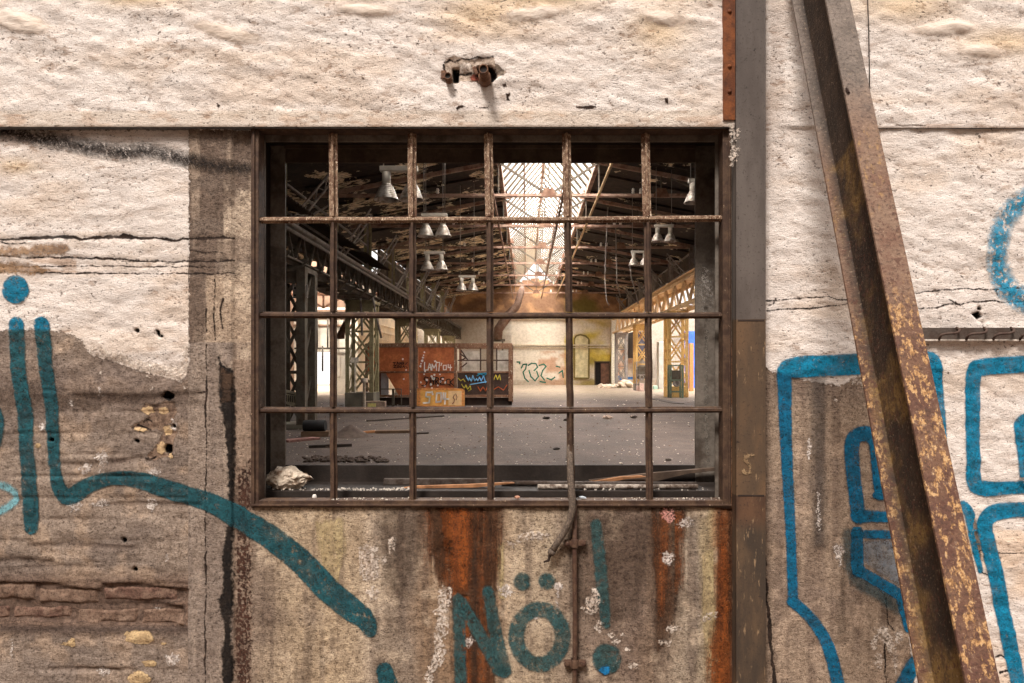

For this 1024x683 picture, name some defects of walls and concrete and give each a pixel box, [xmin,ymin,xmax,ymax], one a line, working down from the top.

flaking render [442,55,510,101]
crack [766,296,847,311]
crack [916,287,1024,309]
crack [0,233,235,683]
flaking render [90,345,189,461]
leakage [217,356,237,503]
spalling [0,567,189,645]
leakage [218,523,235,683]
rust [235,459,254,683]
rust [428,508,501,683]
rust [651,508,685,651]
rust [706,510,732,683]